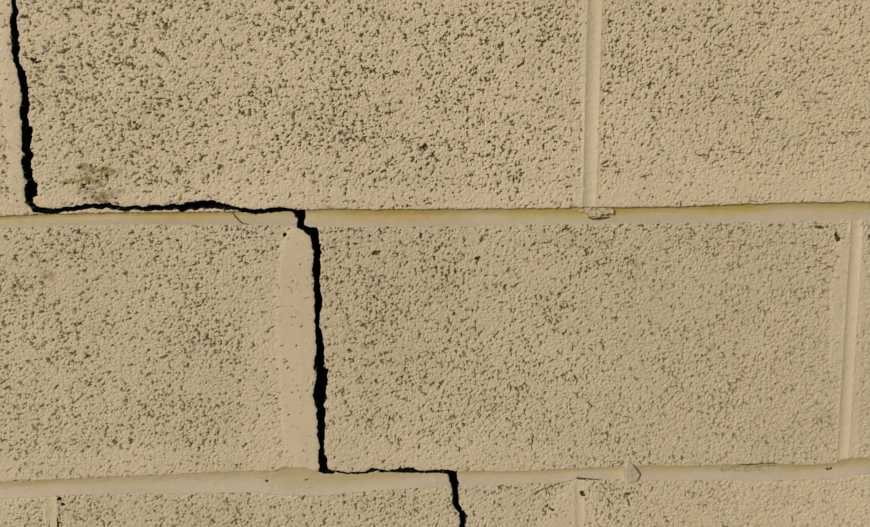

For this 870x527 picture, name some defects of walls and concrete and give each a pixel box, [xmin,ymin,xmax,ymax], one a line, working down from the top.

crack [10,0,468,527]